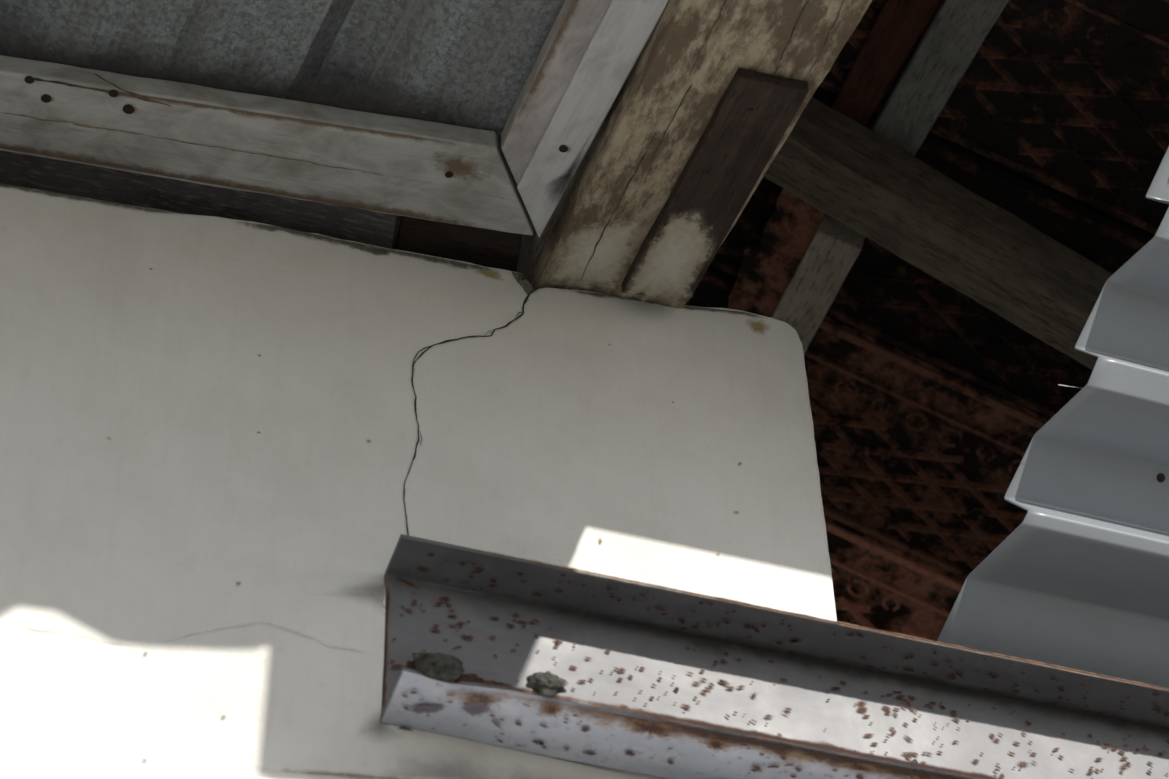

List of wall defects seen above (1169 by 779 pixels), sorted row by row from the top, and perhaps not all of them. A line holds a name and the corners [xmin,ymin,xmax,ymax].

crack [403,287,534,535]
rust [307,771,397,779]
rust [381,553,498,712]
rust [437,559,1169,779]